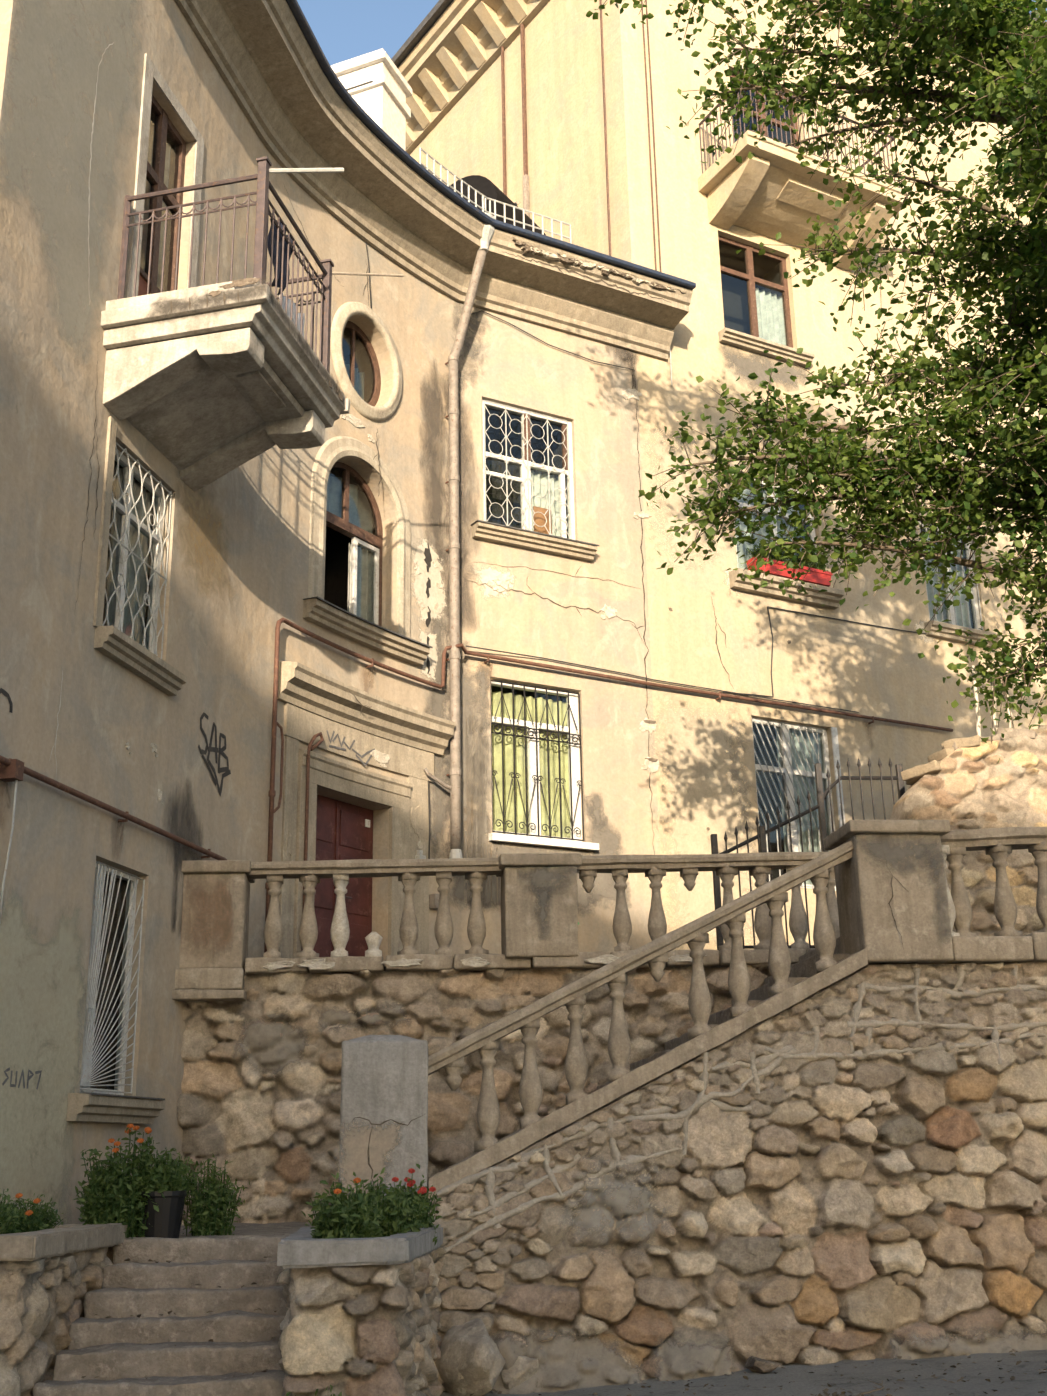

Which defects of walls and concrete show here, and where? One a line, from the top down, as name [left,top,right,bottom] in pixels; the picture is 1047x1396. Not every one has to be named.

crack [88,43,113,259]
crack [75,337,100,607]
flaking render [411,538,447,680]
water stain [423,302,629,933]
crack [460,352,655,855]
crack [711,597,733,687]
water stain [169,793,200,930]
crack [341,1115,423,1185]